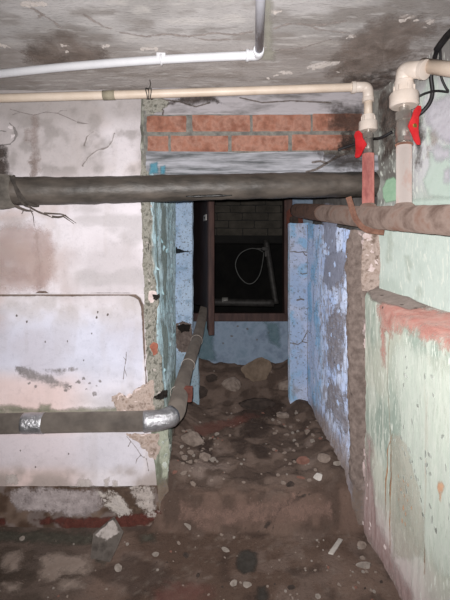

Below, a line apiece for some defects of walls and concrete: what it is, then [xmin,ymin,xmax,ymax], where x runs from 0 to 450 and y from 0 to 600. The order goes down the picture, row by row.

water stain [29,35,101,65]
water stain [334,17,437,74]
crack [162,99,210,115]
crack [240,96,331,104]
water stain [0,228,52,287]
spalling [318,222,426,490]
water stain [16,367,101,396]
water stain [10,486,155,518]